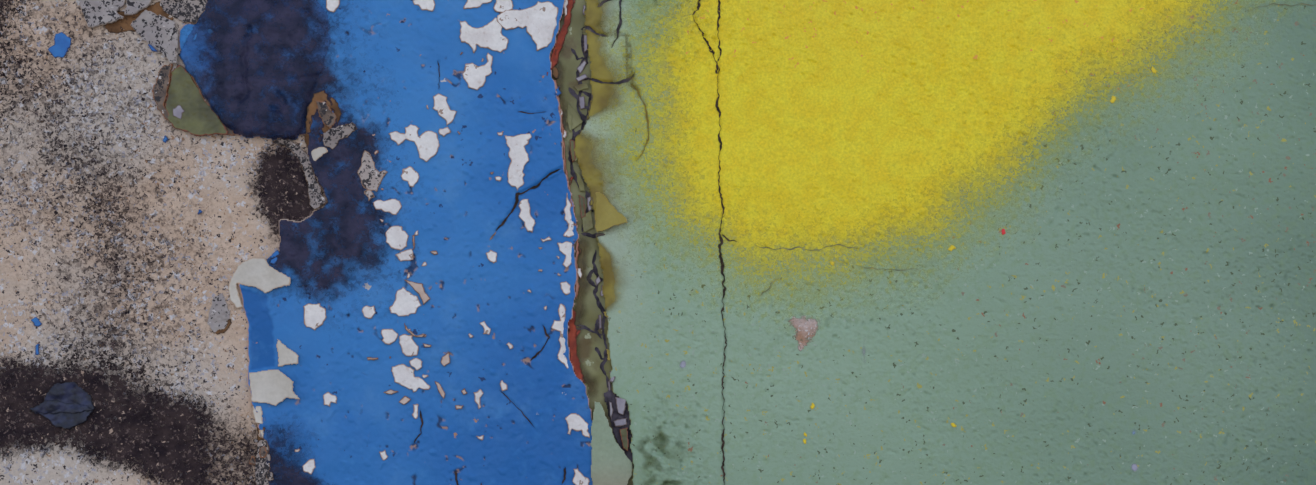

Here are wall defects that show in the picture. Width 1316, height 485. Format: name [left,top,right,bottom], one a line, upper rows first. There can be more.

peeling [79,0,235,143]
spalling [413,0,435,11]
spalling [459,0,590,139]
peeling [272,91,357,210]
peeling [207,250,291,335]
spalling [303,303,327,330]
spalling [357,93,483,419]
spalling [490,131,582,369]
crack [693,0,918,484]
peeling [249,339,300,485]
spalling [295,449,316,474]
peeling [565,349,633,485]